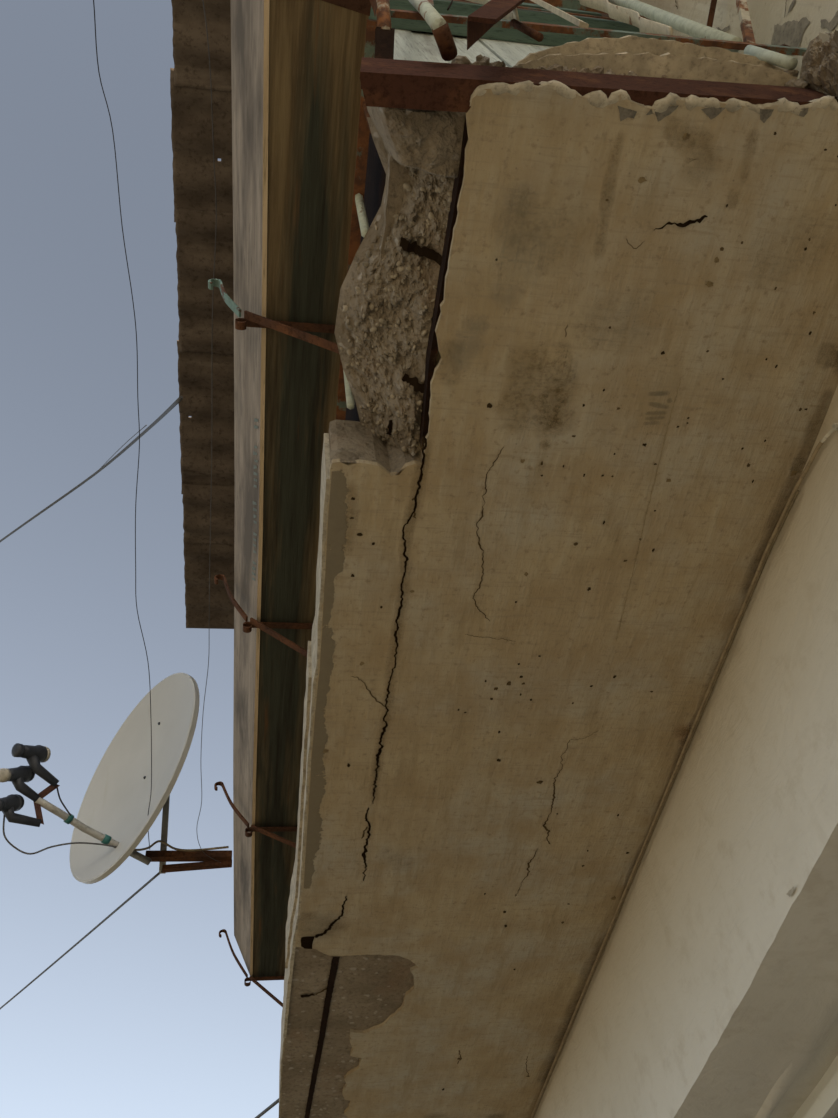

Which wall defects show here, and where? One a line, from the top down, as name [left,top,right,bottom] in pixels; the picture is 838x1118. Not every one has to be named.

flaking render [771,0,838,55]
crack [783,30,838,102]
spalling [334,35,838,456]
crack [465,447,511,641]
crack [301,438,427,949]
crack [515,730,599,896]
spalling [280,947,415,1118]